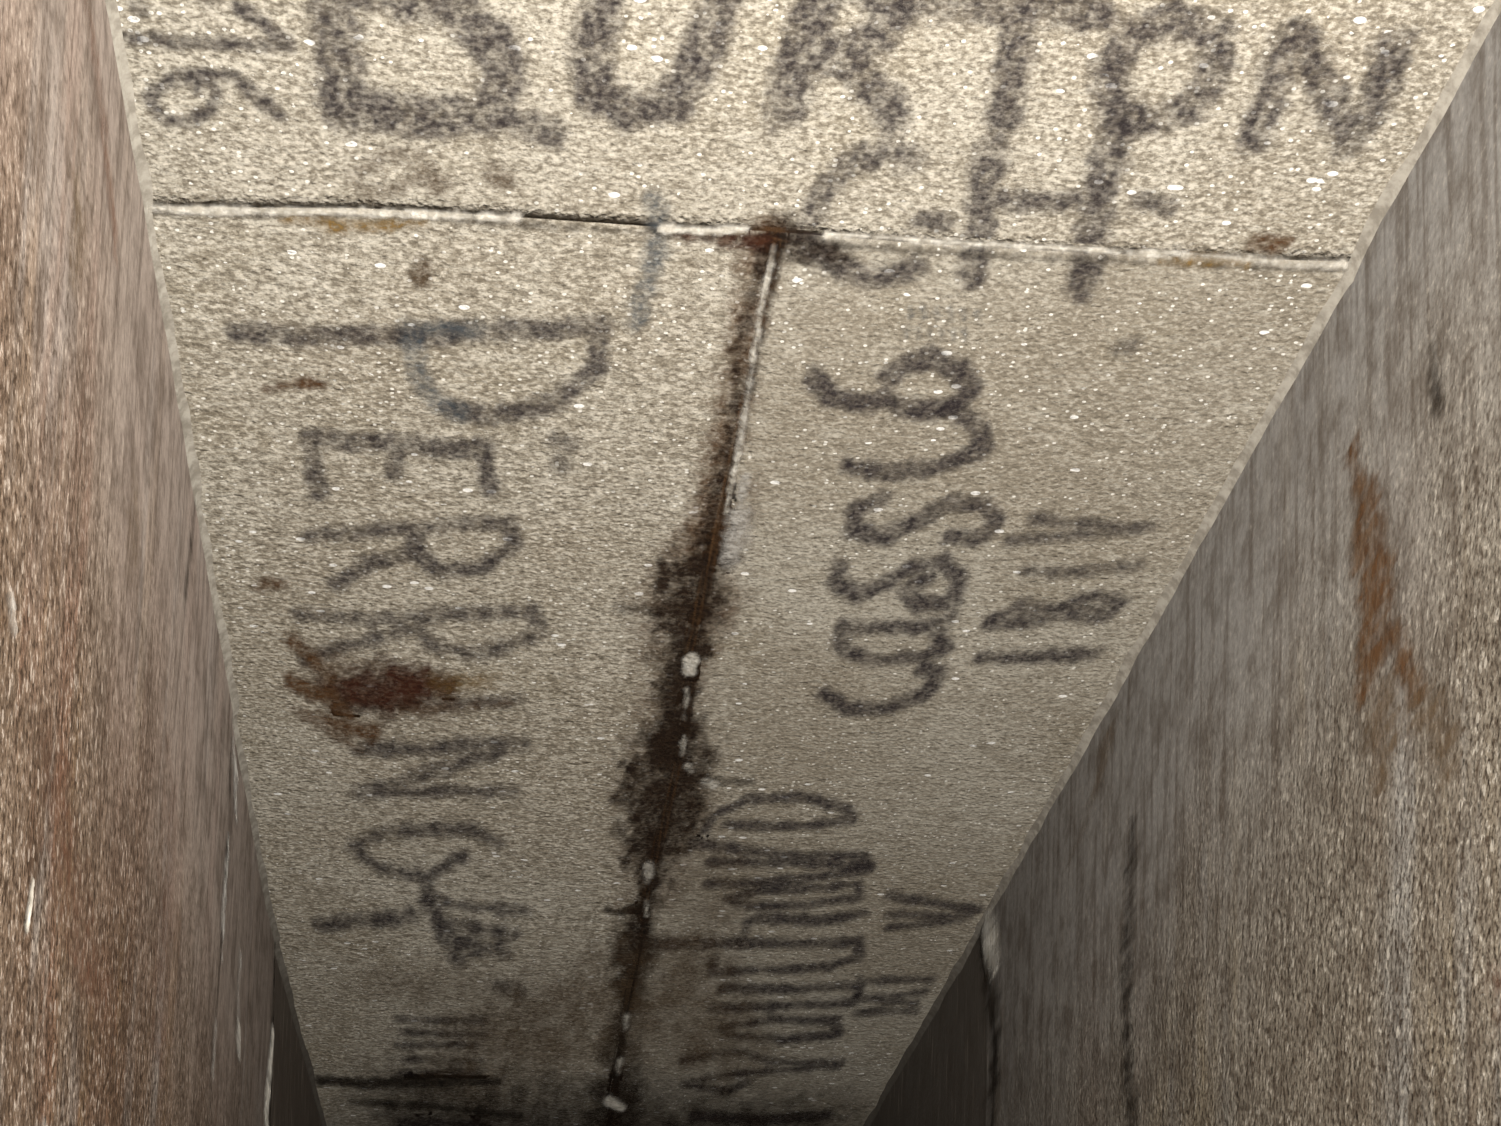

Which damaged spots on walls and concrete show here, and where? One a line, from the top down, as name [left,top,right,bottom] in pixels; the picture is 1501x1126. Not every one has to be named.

crack [149,205,521,222]
crack [824,232,1192,258]
crack [1229,256,1347,268]
crack [651,224,780,746]
corrosion [285,636,460,742]
leakage [408,215,848,1126]
crack [605,797,674,937]
crack [604,982,635,1126]